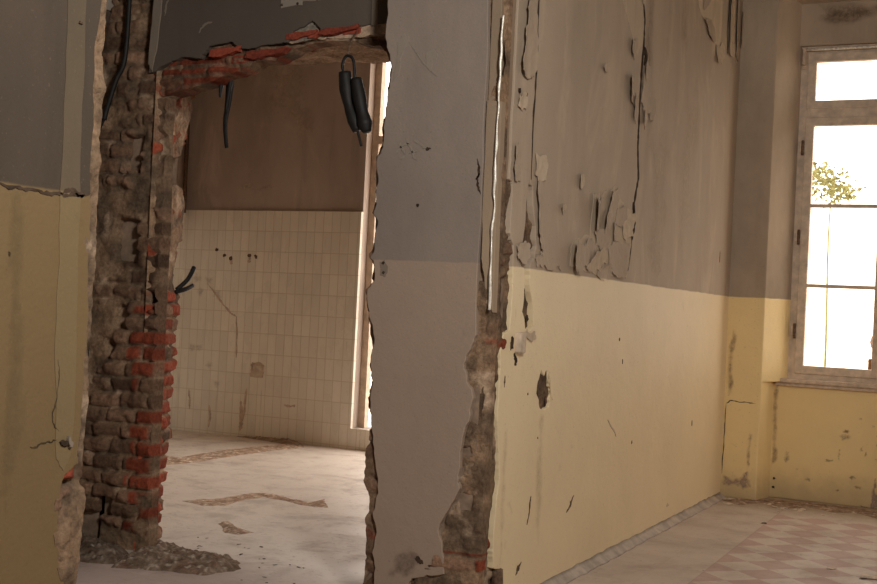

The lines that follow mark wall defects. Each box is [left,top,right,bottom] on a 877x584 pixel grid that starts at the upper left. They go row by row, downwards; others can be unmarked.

peeling [623,0,646,60]
peeling [699,0,744,64]
crack [628,3,648,269]
peeling [631,61,656,129]
flaking render [53,0,438,584]
spalling [411,0,637,584]
crack [31,364,60,448]